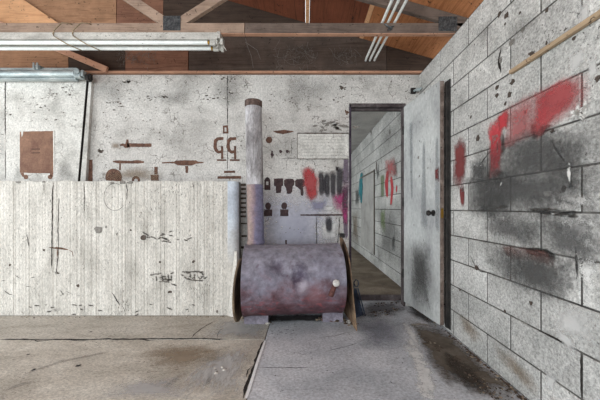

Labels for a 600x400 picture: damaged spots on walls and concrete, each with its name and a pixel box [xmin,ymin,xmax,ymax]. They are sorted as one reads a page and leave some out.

crack [51,185,59,272]
crack [0,320,223,342]
leakage [403,323,435,400]